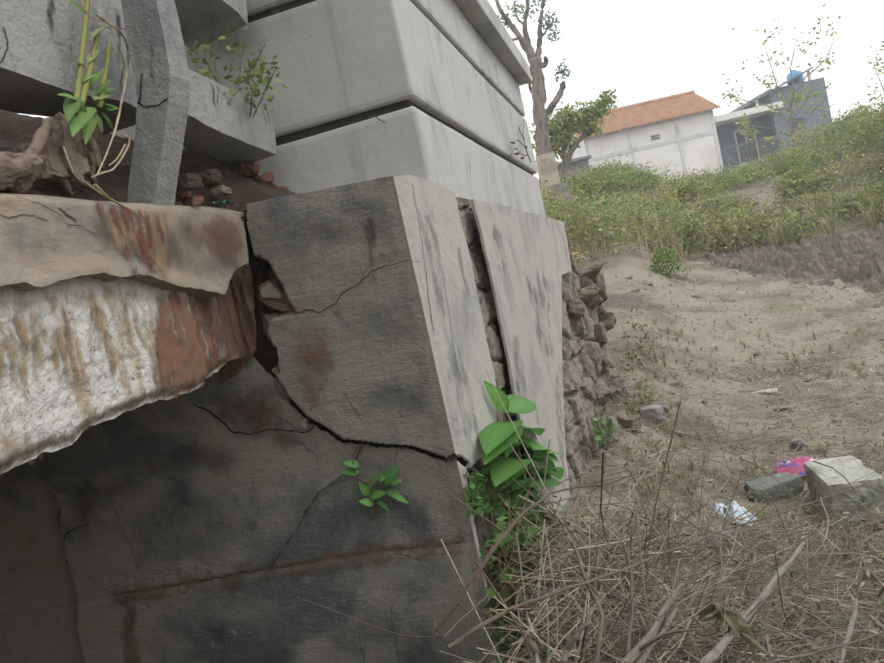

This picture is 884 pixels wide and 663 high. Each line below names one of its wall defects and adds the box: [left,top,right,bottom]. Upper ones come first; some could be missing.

crack [118,45,167,108]
crack [0,195,96,235]
crack [244,210,278,378]
spalling [255,255,294,400]
crack [296,184,461,386]
spalling [0,352,230,473]
crack [194,399,473,476]